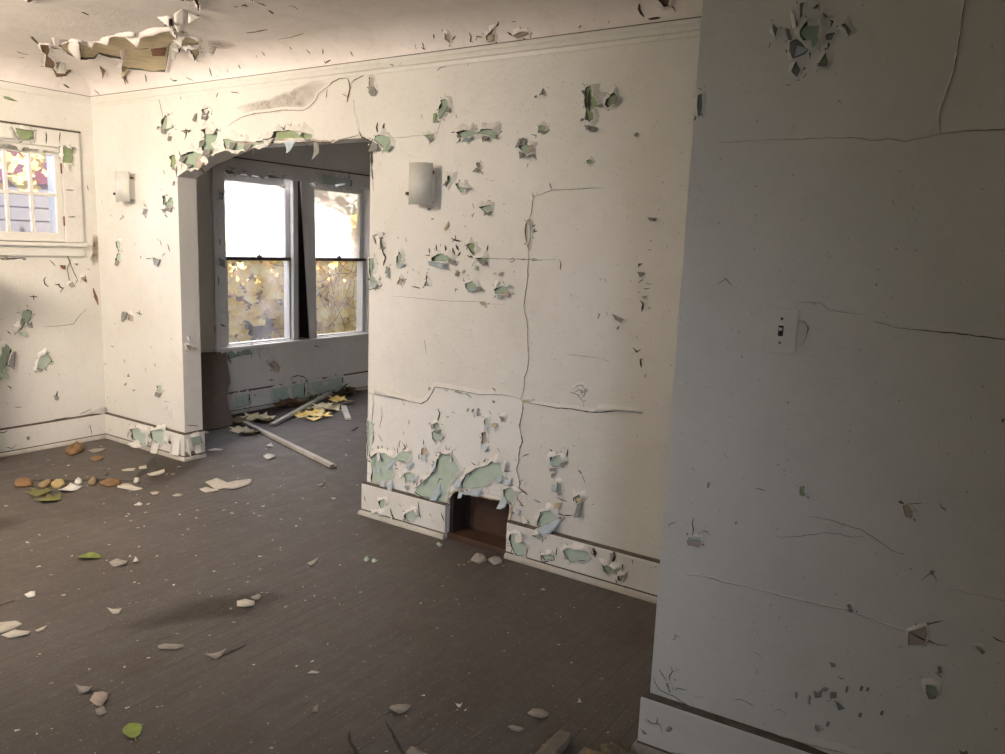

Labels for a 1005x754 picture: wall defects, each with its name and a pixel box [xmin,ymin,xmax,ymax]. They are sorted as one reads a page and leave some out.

spalling [18,0,209,88]
peeling [157,93,332,218]
peeling [421,96,502,143]
crack [528,184,605,218]
peeling [580,83,622,132]
crack [716,0,1005,143]
peeling [368,200,515,308]
peeling [0,295,37,389]
crack [369,251,617,487]
crack [795,300,1005,348]
peeling [127,423,223,456]
peeling [364,389,633,583]